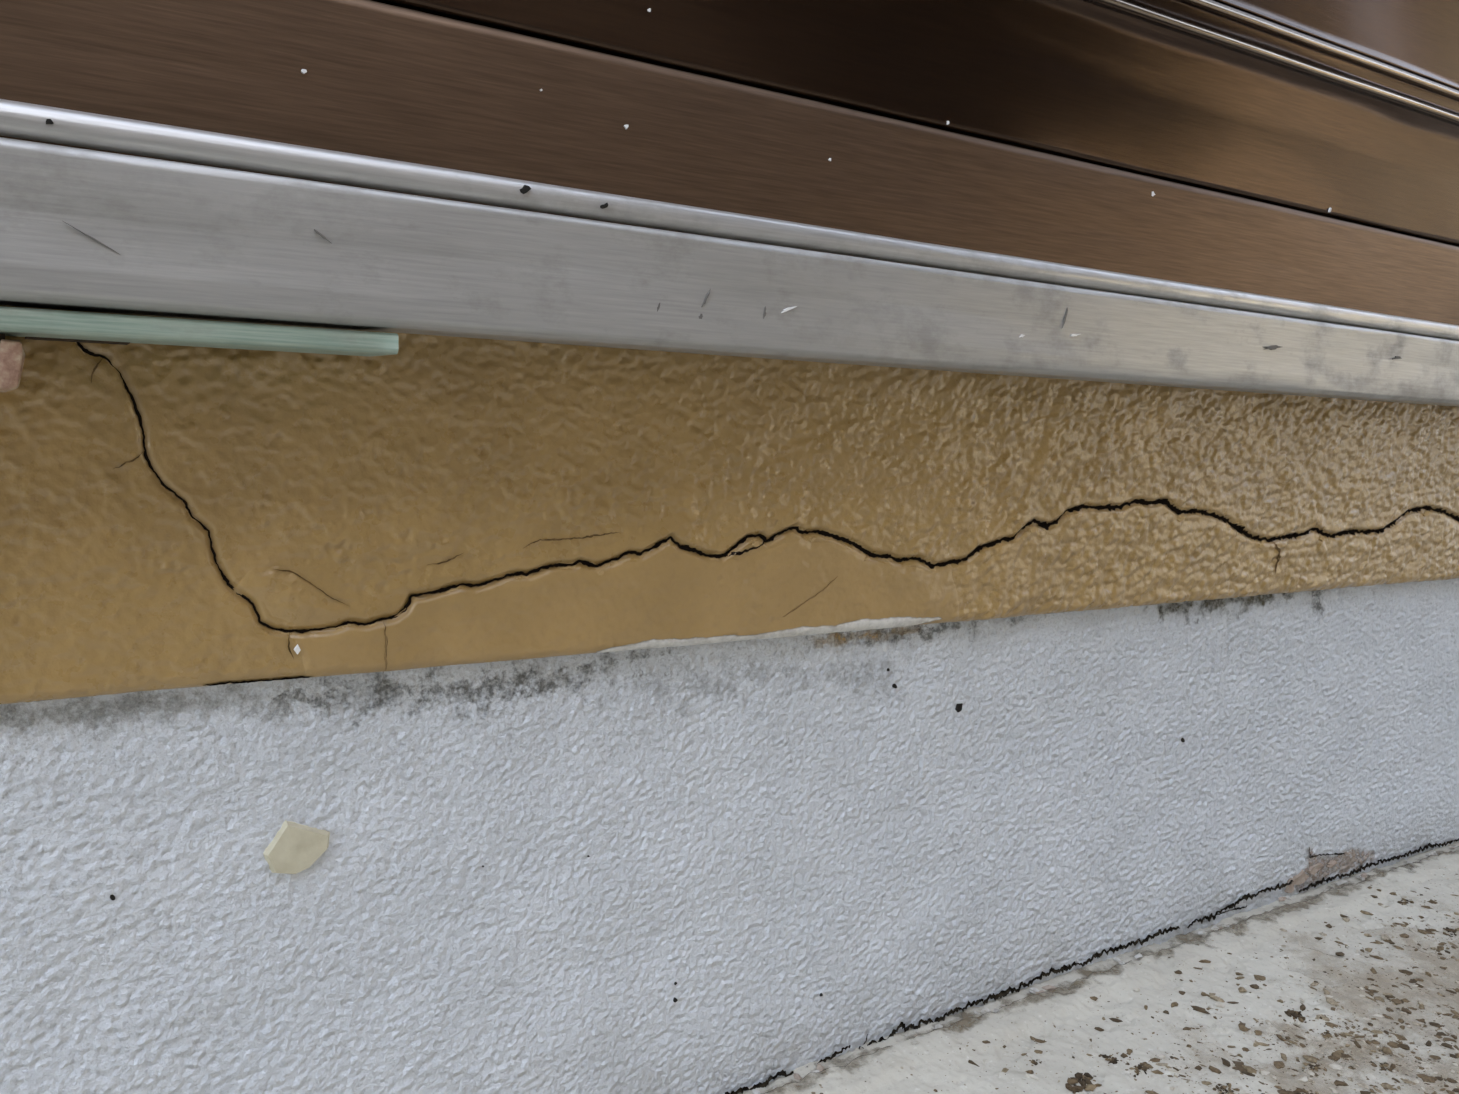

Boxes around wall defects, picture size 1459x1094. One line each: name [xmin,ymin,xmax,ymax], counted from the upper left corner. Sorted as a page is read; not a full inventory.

crack [75,342,1459,686]
damp [835,622,976,644]
damp [1159,593,1293,622]
damp [347,652,649,726]
crack [725,838,1459,1094]